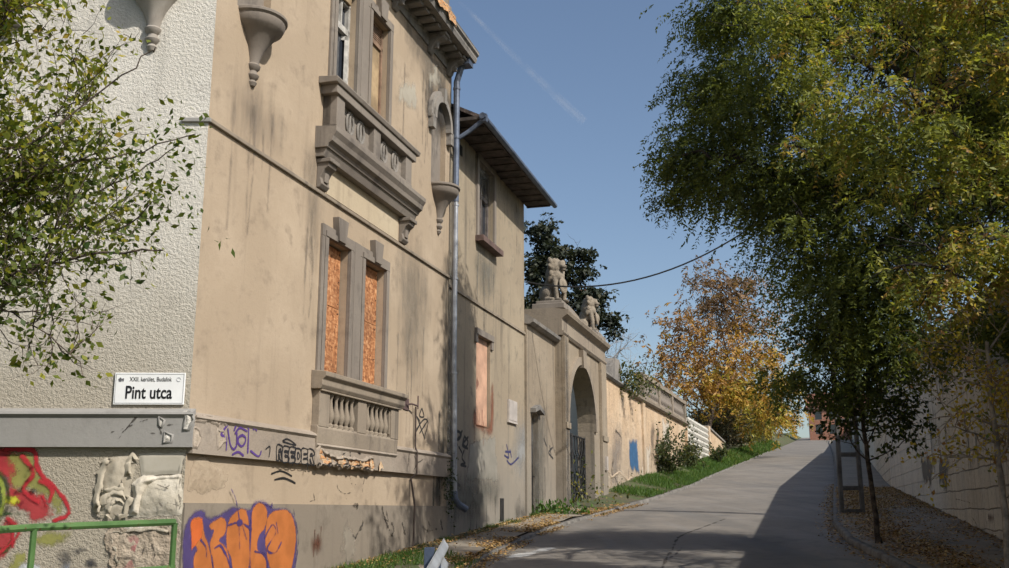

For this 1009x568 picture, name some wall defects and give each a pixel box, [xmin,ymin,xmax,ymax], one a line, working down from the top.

crack [661,520,721,568]